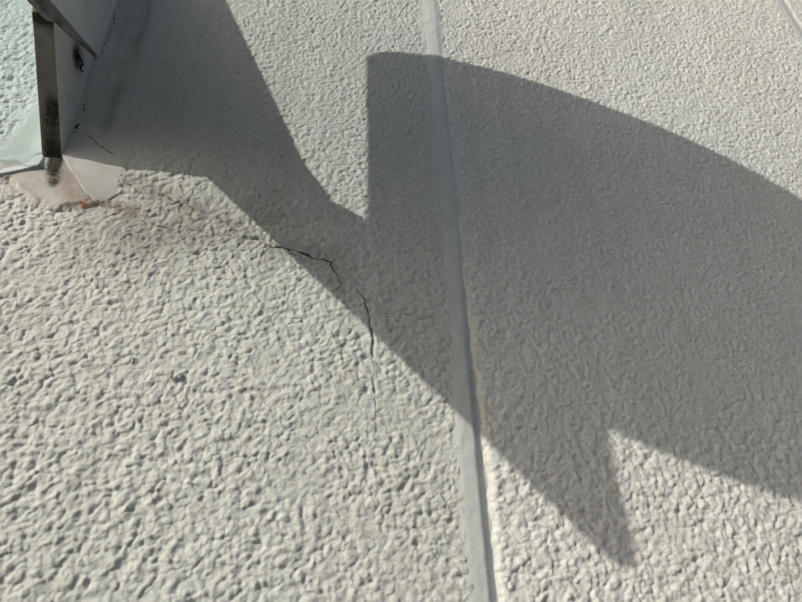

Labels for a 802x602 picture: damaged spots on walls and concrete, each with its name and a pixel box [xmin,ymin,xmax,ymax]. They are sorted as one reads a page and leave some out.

crack [125,181,252,241]
crack [270,245,454,439]